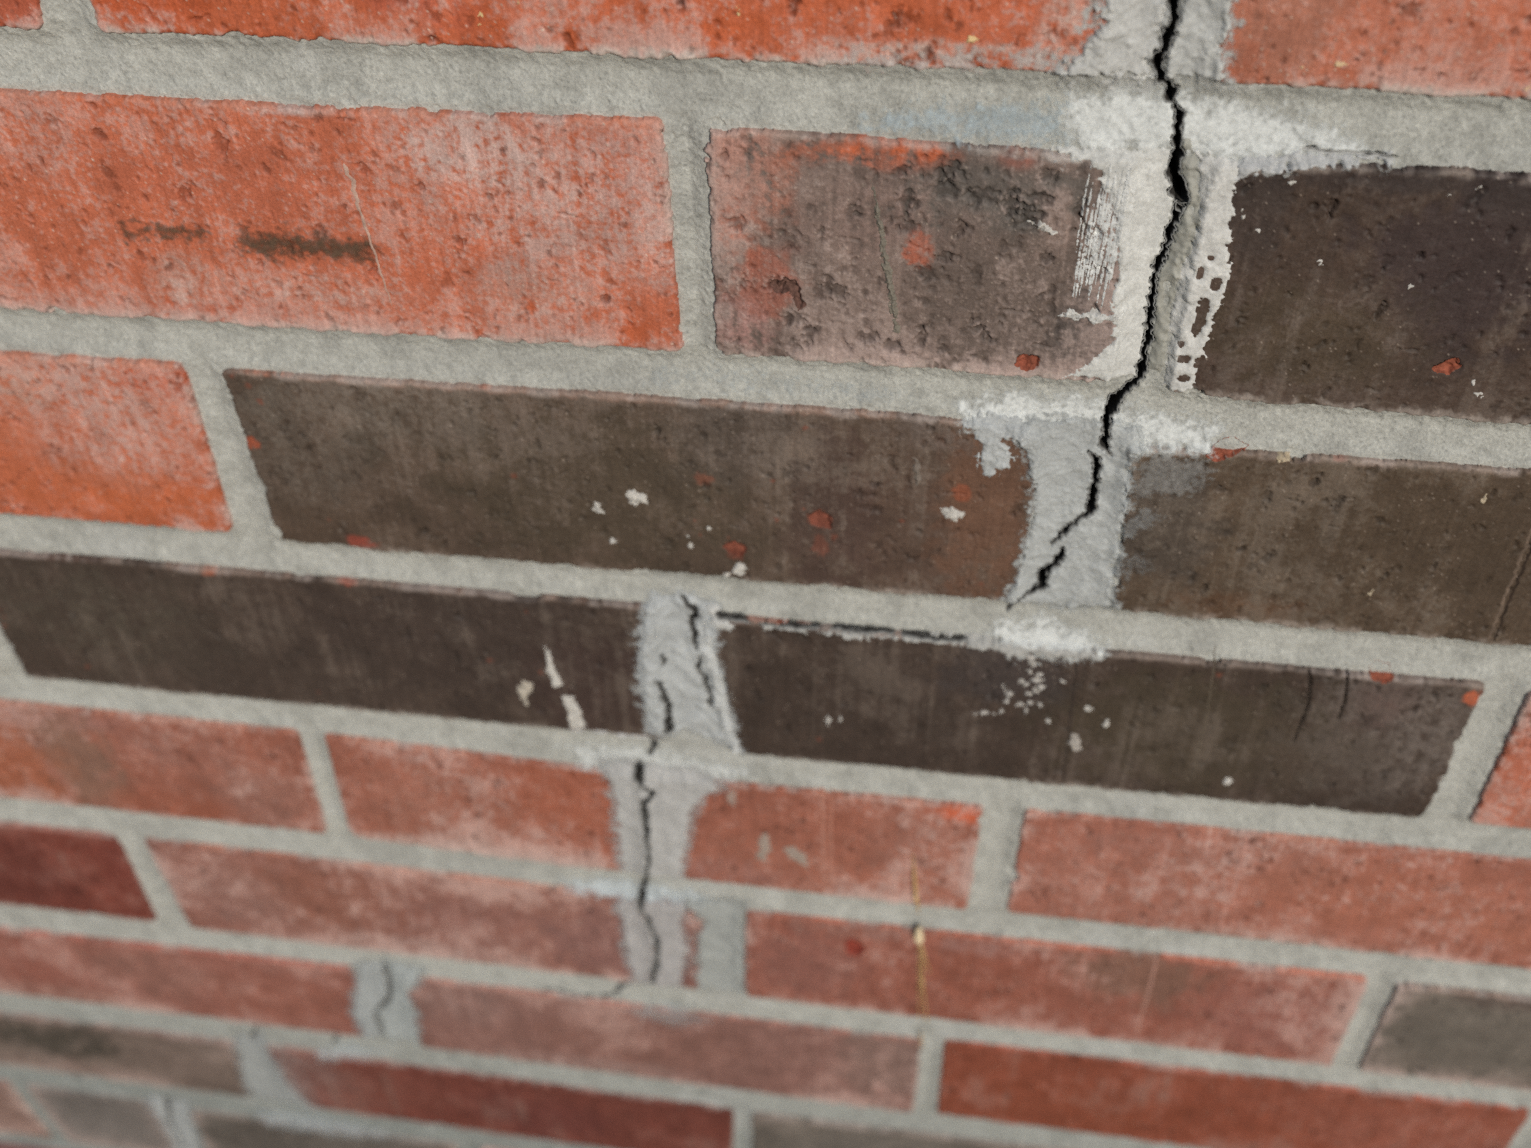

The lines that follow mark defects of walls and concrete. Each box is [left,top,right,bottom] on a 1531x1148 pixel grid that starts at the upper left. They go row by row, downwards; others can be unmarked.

crack [1006,0,1191,611]
crack [543,594,967,999]
crack [373,963,393,1036]